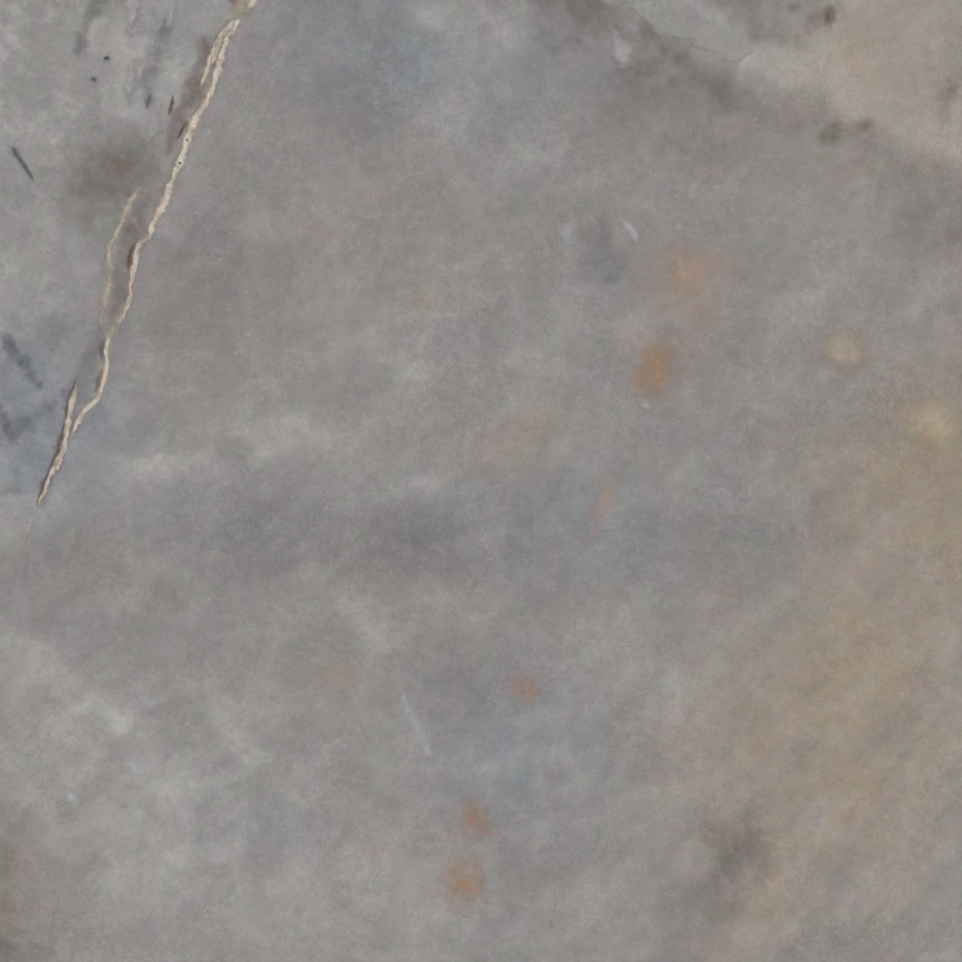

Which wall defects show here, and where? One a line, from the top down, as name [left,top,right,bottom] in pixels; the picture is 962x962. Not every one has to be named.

crack [37,0,257,506]